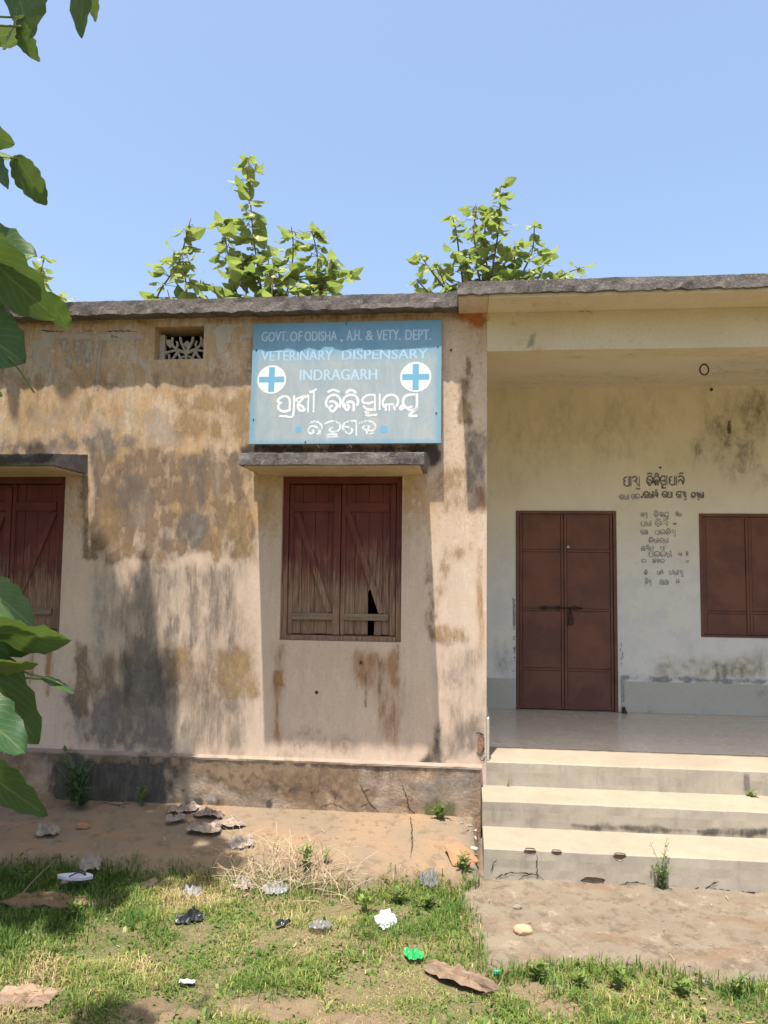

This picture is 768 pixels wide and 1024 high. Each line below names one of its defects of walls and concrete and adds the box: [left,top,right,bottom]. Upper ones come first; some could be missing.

leakage [459,358,484,503]
leakage [0,430,441,615]
leakage [49,615,375,812]
rust [274,671,283,740]
rust [358,651,397,728]
leakage [652,665,765,684]
crack [321,784,379,813]
leakage [697,829,767,837]